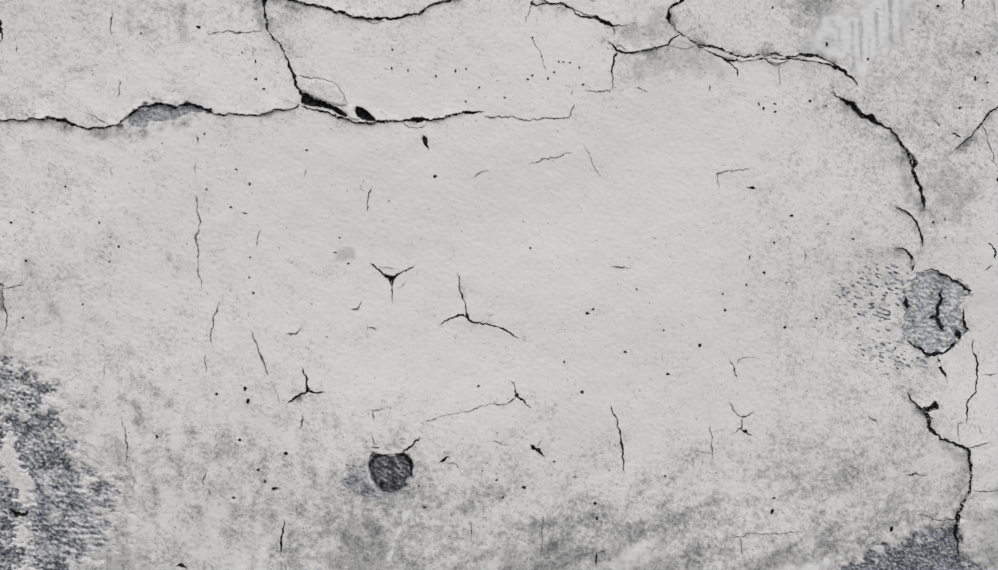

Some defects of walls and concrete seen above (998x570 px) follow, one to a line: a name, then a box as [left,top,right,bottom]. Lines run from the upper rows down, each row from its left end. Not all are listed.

crack [0,0,926,271]
crack [0,283,19,331]
crack [194,196,202,285]
crack [204,304,219,374]
crack [250,330,323,428]
crack [371,263,414,299]
crack [427,381,530,421]
crack [441,275,519,338]
peeling [902,268,972,357]
peeling [0,340,134,570]
spalling [369,436,421,493]
crack [908,341,998,556]